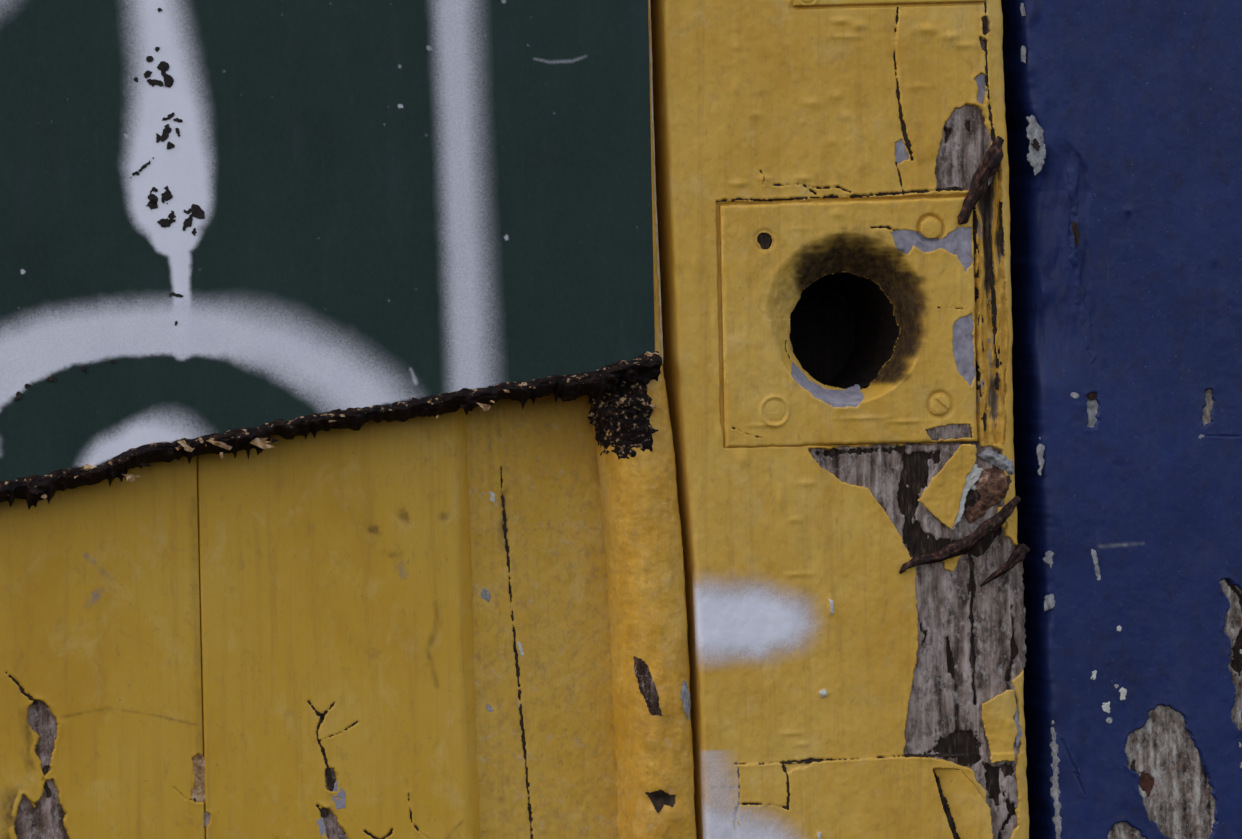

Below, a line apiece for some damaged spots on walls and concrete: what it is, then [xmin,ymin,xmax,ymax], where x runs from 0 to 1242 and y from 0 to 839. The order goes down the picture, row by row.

crack [716,7,962,202]
peeling [935,105,994,191]
spalling [1026,115,1046,176]
peeling [870,226,973,272]
peeling [952,314,975,387]
spalling [1036,437,1045,476]
peeling [808,440,1027,839]
spalling [1043,551,1054,569]
spalling [1044,594,1056,611]
peeling [1219,579,1242,747]
peeling [6,672,69,839]
peeling [1108,705,1216,839]